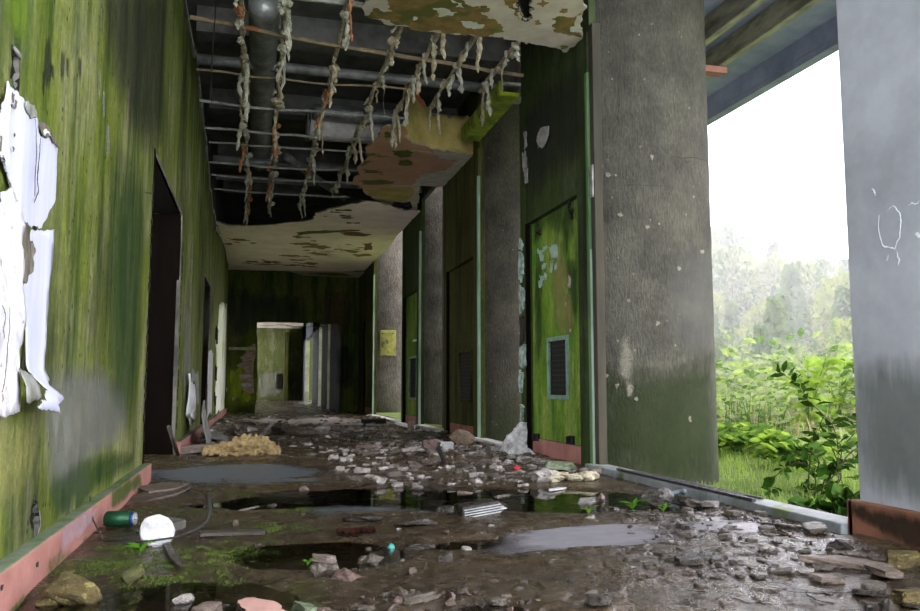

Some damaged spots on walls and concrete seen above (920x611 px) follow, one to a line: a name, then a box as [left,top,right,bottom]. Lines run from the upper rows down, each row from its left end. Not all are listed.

peeling [367,0,505,37]
peeling [535,9,583,49]
damp [43,41,81,94]
damp [107,0,166,138]
peeling [392,150,471,186]
peeling [522,126,549,184]
peeling [0,44,64,418]
peeling [245,209,372,267]
peeling [537,244,558,288]
peeling [176,244,235,429]
damp [50,375,125,512]
damp [49,514,92,571]